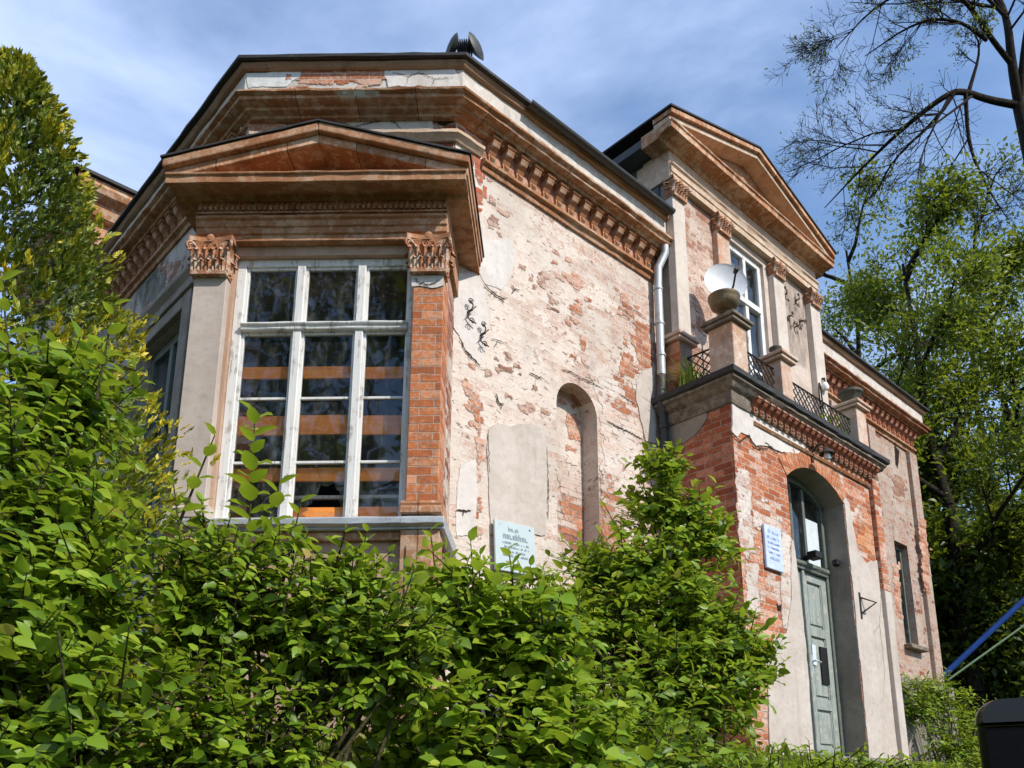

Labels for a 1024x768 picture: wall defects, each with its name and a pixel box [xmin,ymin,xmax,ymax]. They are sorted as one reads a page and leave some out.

flaking render [285,70,391,88]
flaking render [461,352,522,482]
flaking render [505,385,551,416]
flaking render [518,257,654,552]
flaking render [887,472,908,504]
flaking render [475,497,484,540]
flaking render [856,513,876,556]
flaking render [918,518,932,598]
flaking render [891,555,904,619]